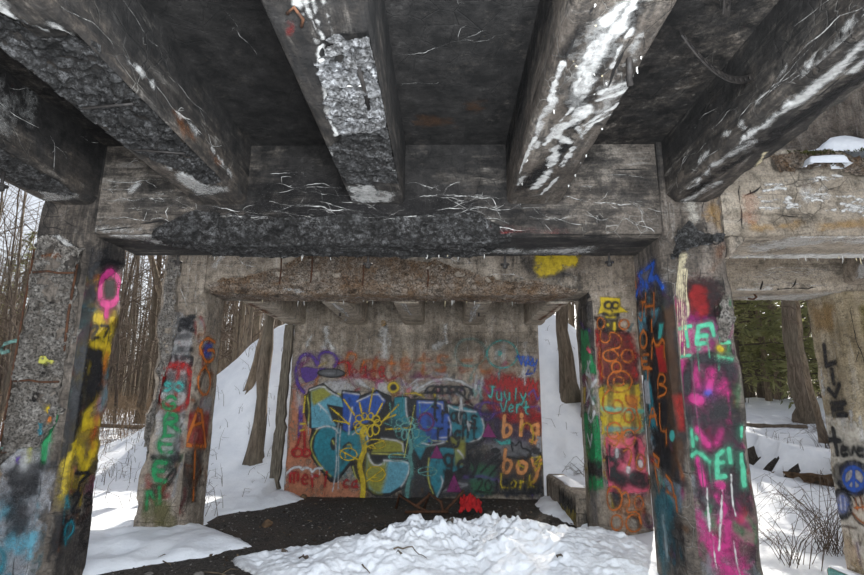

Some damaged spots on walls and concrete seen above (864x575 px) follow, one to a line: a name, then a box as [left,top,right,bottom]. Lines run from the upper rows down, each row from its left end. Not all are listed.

spalling [0,148,75,196]
spalling [0,14,221,185]
spalling [313,34,399,186]
leakage [514,0,638,195]
leakage [685,157,743,201]
spalling [771,150,864,175]
leakage [782,43,864,113]
spalling [0,235,84,575]
spalling [144,210,577,460]